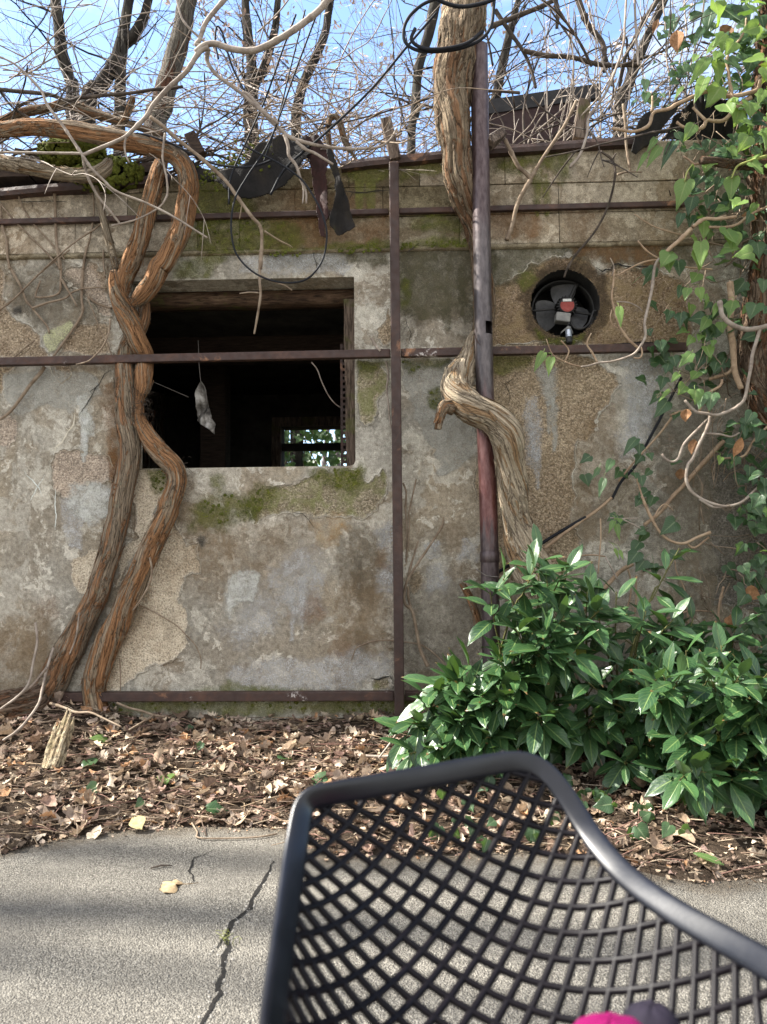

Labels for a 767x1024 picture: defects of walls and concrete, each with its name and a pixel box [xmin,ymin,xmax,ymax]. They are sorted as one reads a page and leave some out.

peeling [48,448,116,500]
peeling [70,549,98,594]
peeling [112,470,167,591]
peeling [106,522,202,691]
peeling [493,252,695,584]